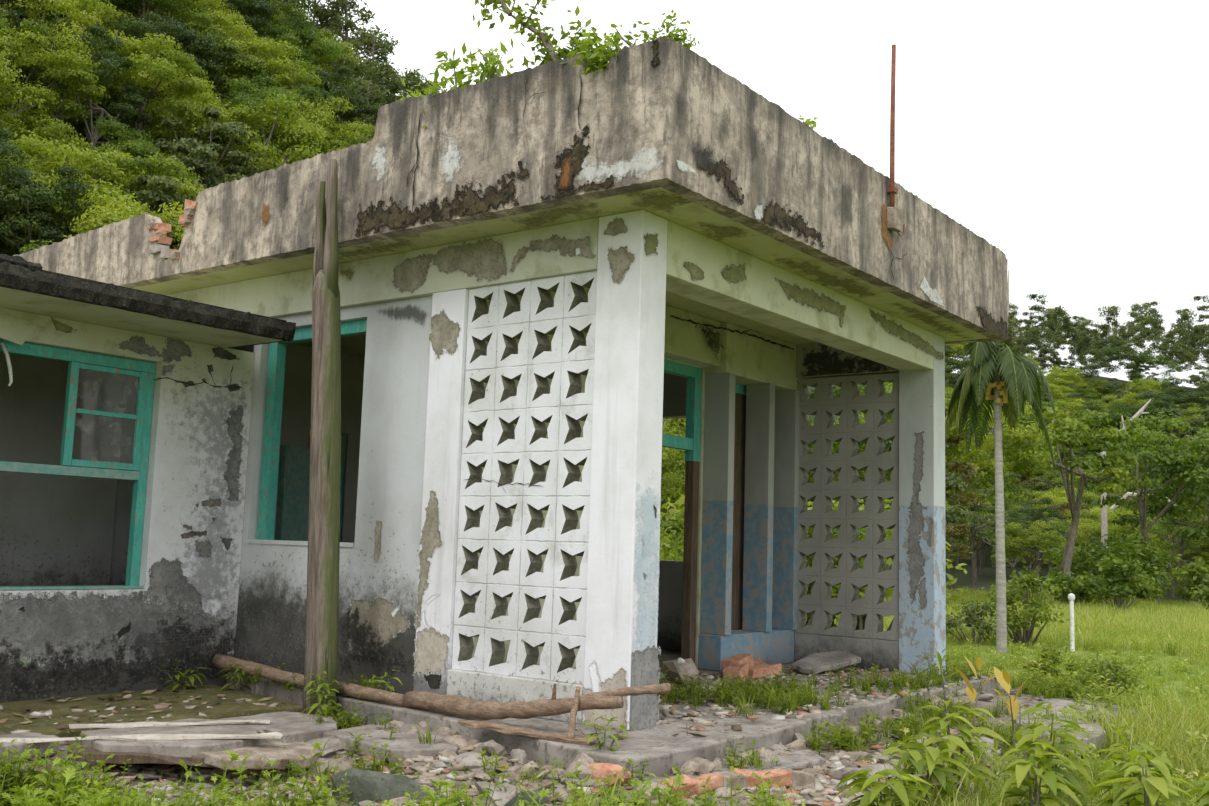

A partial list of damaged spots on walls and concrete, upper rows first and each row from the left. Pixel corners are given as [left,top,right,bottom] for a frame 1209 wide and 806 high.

peeling [392,216,659,294]
corrosion [882,204,893,250]
peeling [117,334,240,388]
crack [153,363,243,389]
peeling [429,309,461,360]
crack [670,315,794,350]
peeling [181,384,245,558]
peeling [906,430,933,611]
peeling [0,557,237,669]
leakage [0,586,307,703]
peeling [348,490,450,689]